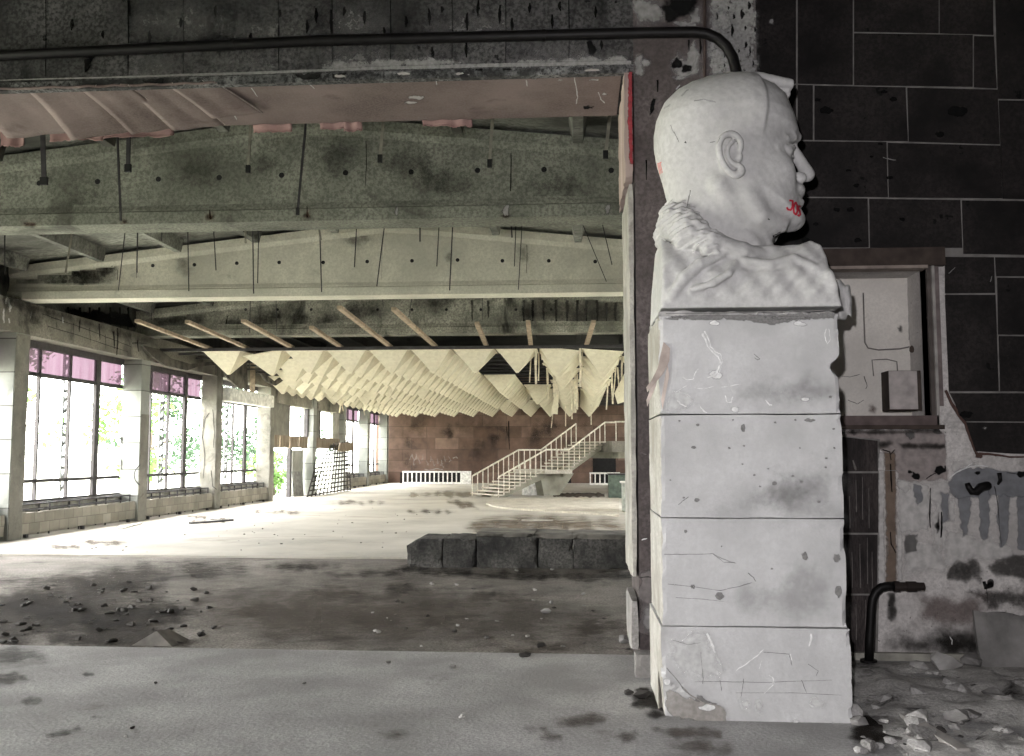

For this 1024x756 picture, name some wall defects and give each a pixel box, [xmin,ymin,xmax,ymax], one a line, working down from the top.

flaking render [632,0,663,22]
flaking render [635,55,650,75]
flaking render [674,0,758,79]
spalling [945,390,1024,458]
leakage [908,466,1024,581]
crack [664,553,755,602]
crack [667,640,831,696]
spalling [665,686,726,721]